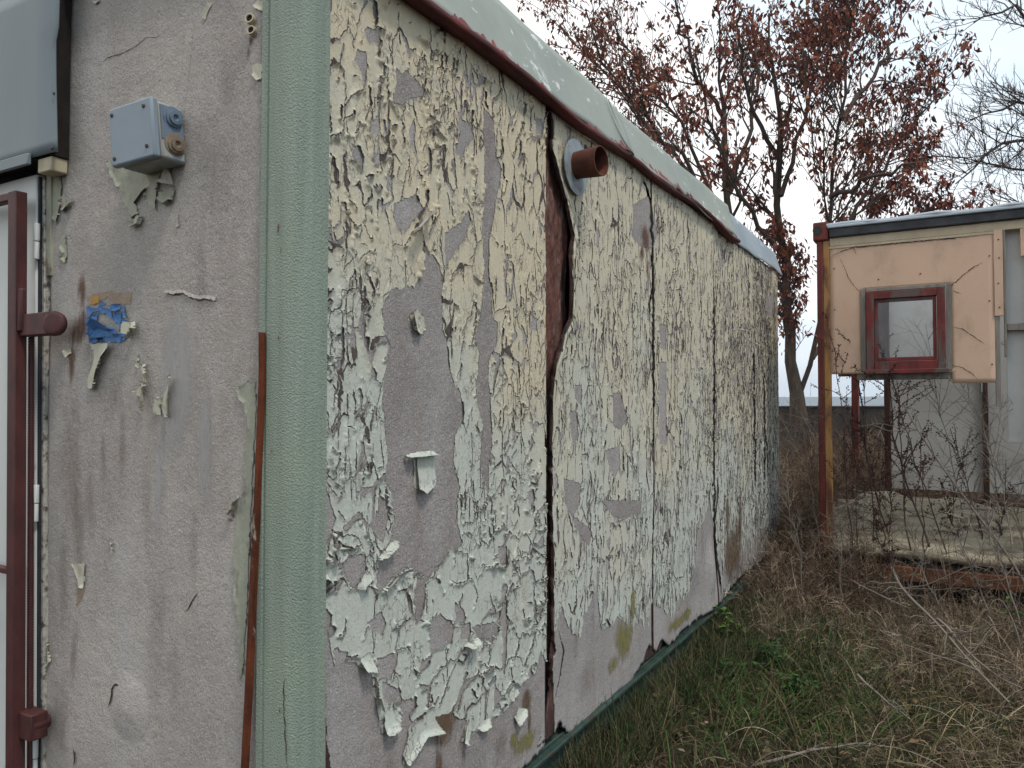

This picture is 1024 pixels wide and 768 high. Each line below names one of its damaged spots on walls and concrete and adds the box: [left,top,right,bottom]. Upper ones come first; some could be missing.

peeling [85,290,136,390]
peeling [106,158,175,228]
peeling [224,381,257,681]
peeling [325,0,781,768]
crack [648,186,656,418]
crack [712,287,722,593]